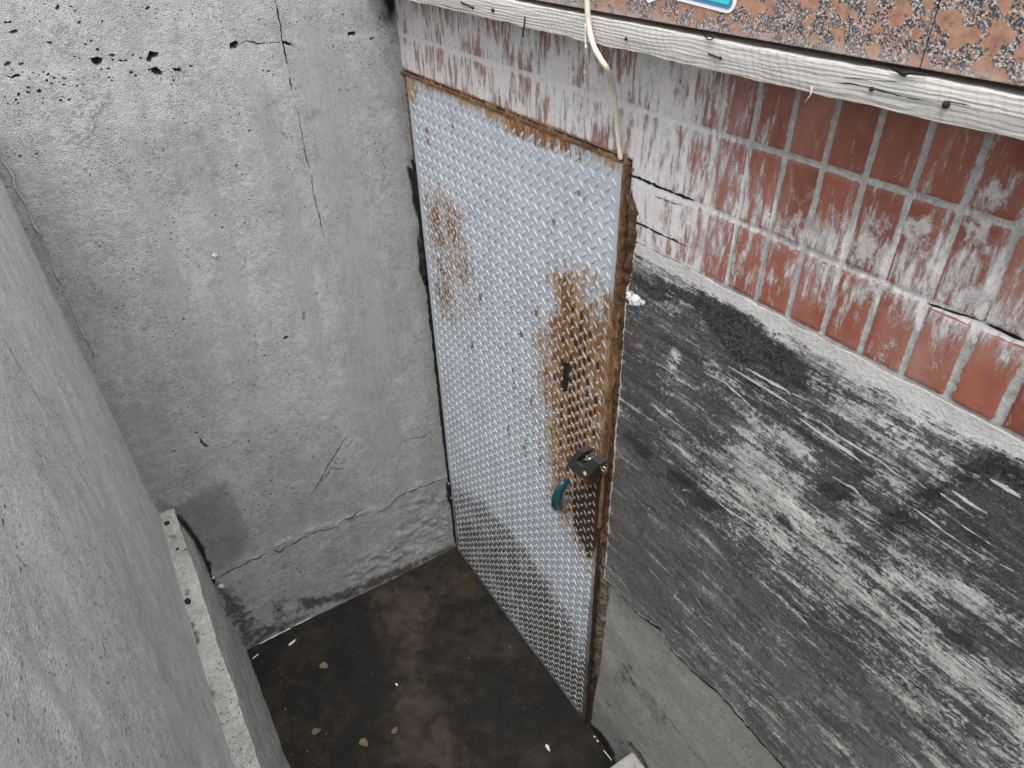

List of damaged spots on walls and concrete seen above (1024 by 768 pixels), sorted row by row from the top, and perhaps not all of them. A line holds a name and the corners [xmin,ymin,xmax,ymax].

crack [240,1,324,237]
rust [405,75,627,170]
rust [425,183,482,321]
crack [636,222,687,247]
crack [629,174,695,205]
crack [928,303,1024,341]
rust [522,263,623,569]
crack [217,480,440,578]